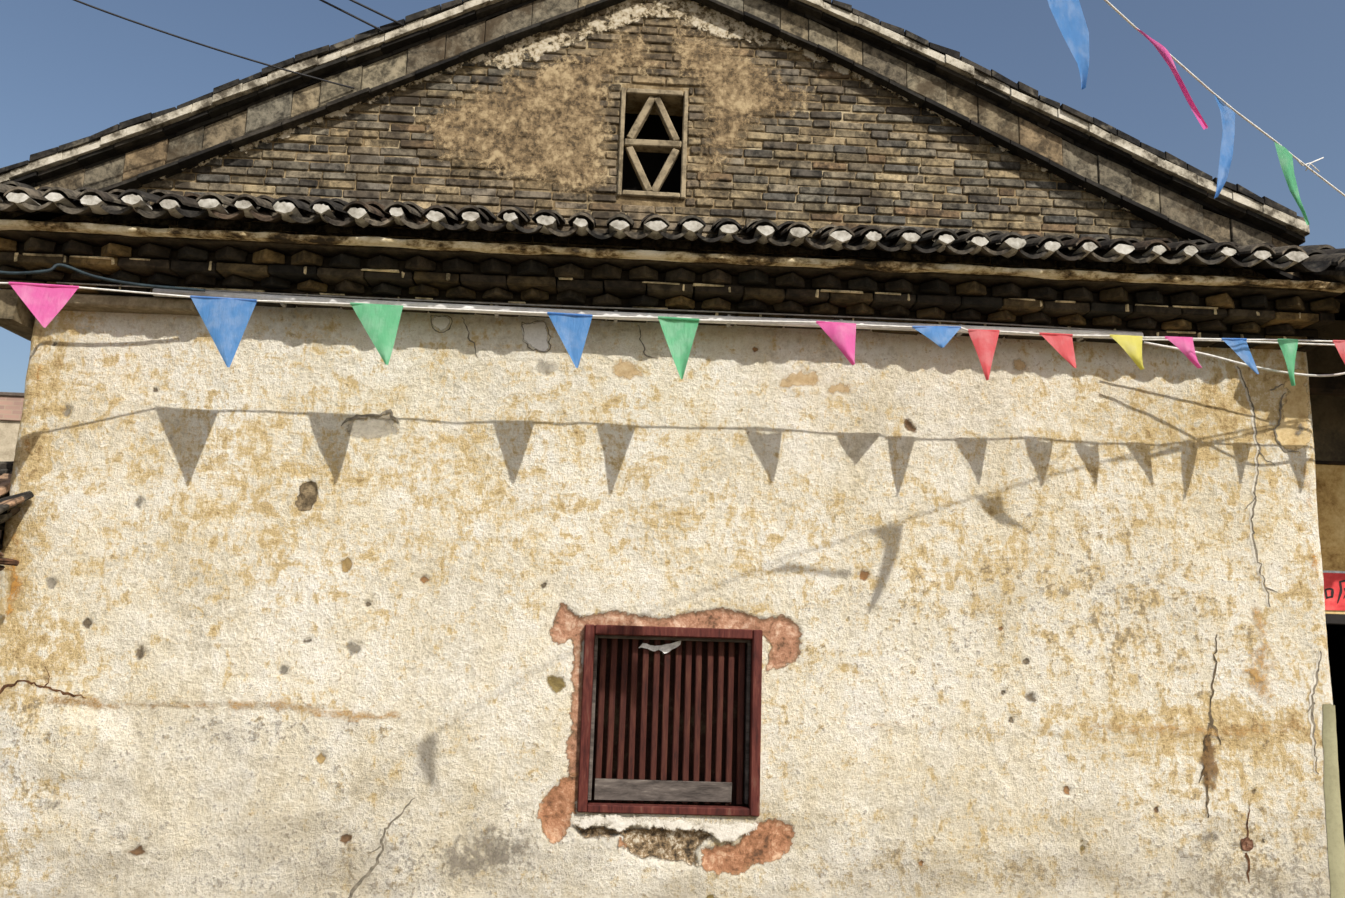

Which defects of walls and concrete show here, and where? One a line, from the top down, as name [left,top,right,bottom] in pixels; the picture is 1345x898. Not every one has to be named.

spalling [622,113,683,193]
spalling [341,409,399,439]
spalling [295,481,318,511]
crack [1235,366,1278,607]
crack [0,667,86,698]
spalling [537,602,803,876]
crack [1199,635,1221,818]
crack [1308,651,1322,774]
crack [348,798,415,898]